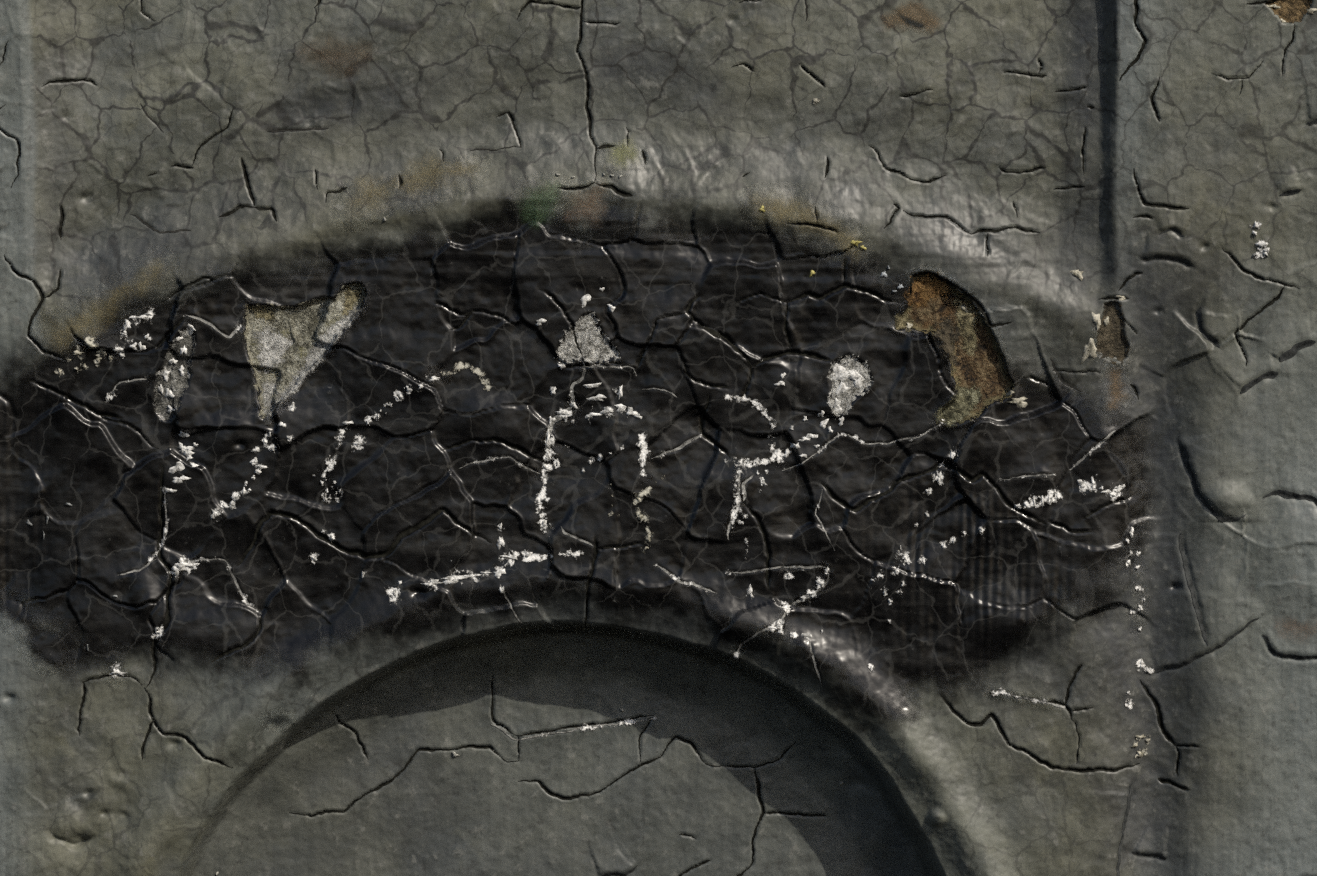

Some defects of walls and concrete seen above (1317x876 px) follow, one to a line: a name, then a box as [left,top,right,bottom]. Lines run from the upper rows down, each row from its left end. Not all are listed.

crack [517,0,633,197]
crack [869,127,1086,256]
crack [4,205,492,768]
spalling [210,282,365,519]
damp [0,200,1151,722]
spalling [553,287,621,370]
peeling [535,383,665,550]
crack [436,156,1132,661]
spalling [724,354,873,558]
corrosion [895,271,1028,427]
crack [289,678,827,876]
crack [941,665,1199,790]